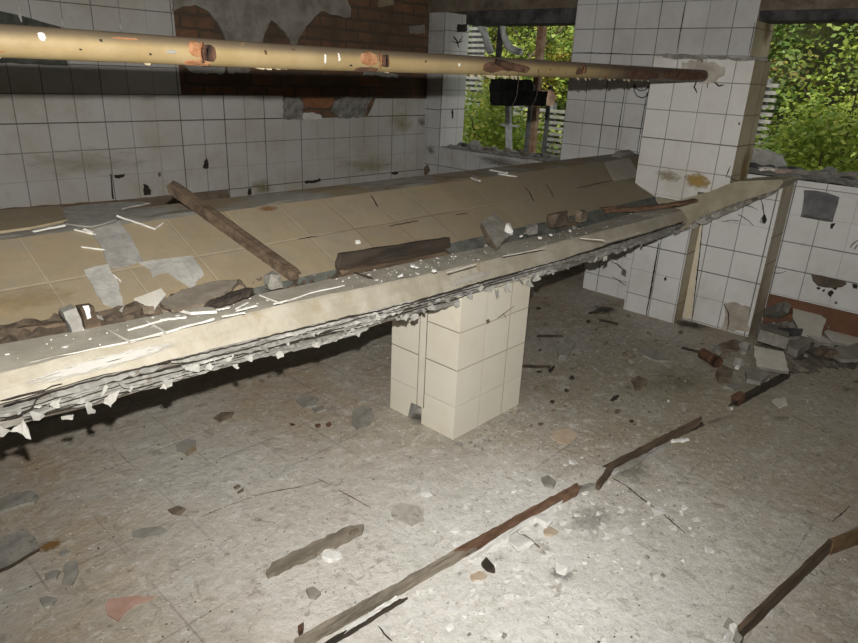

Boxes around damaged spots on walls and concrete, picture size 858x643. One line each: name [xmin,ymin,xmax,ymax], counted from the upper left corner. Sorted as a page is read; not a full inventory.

corrosion [183,41,211,66]
flaking render [172,0,428,120]
corrosion [354,51,382,72]
spalling [662,53,768,93]
damp [661,173,710,188]
peeling [800,190,839,229]
peeling [0,174,778,439]
spalling [811,274,858,304]
crack [612,478,685,533]